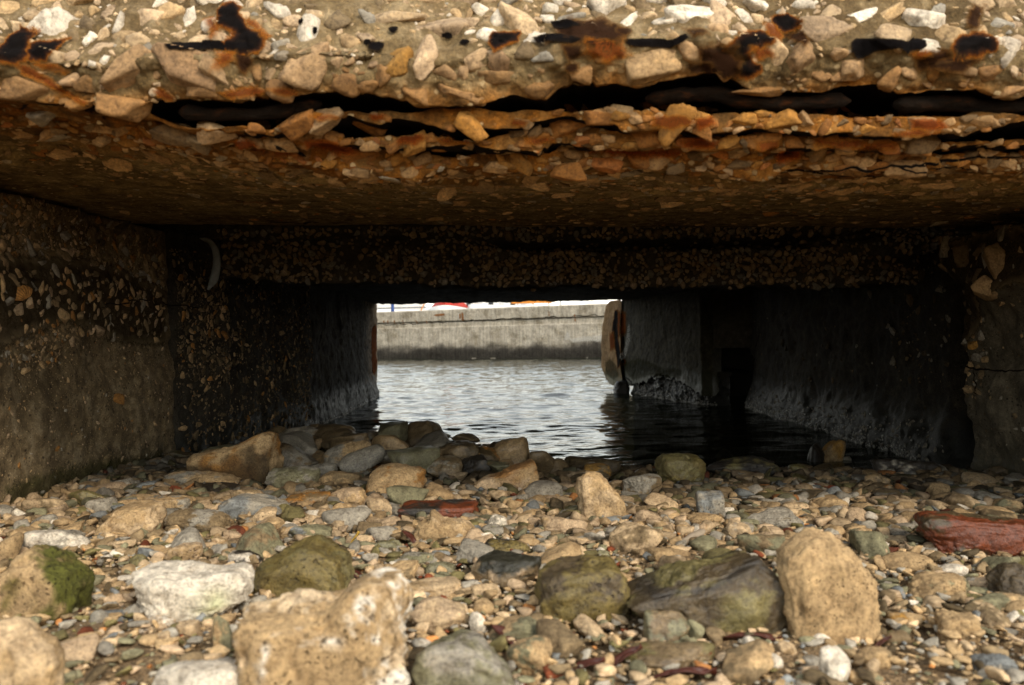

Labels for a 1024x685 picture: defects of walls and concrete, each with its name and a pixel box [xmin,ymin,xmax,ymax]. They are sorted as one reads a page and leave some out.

corrosion [0,24,88,104]
corrosion [205,0,297,100]
corrosion [487,16,632,74]
corrosion [681,13,809,81]
corrosion [910,3,1000,73]
corrosion [304,139,356,156]
corrosion [397,134,471,145]
spalling [0,86,1024,182]
corrosion [592,115,719,159]
corrosion [815,118,946,151]